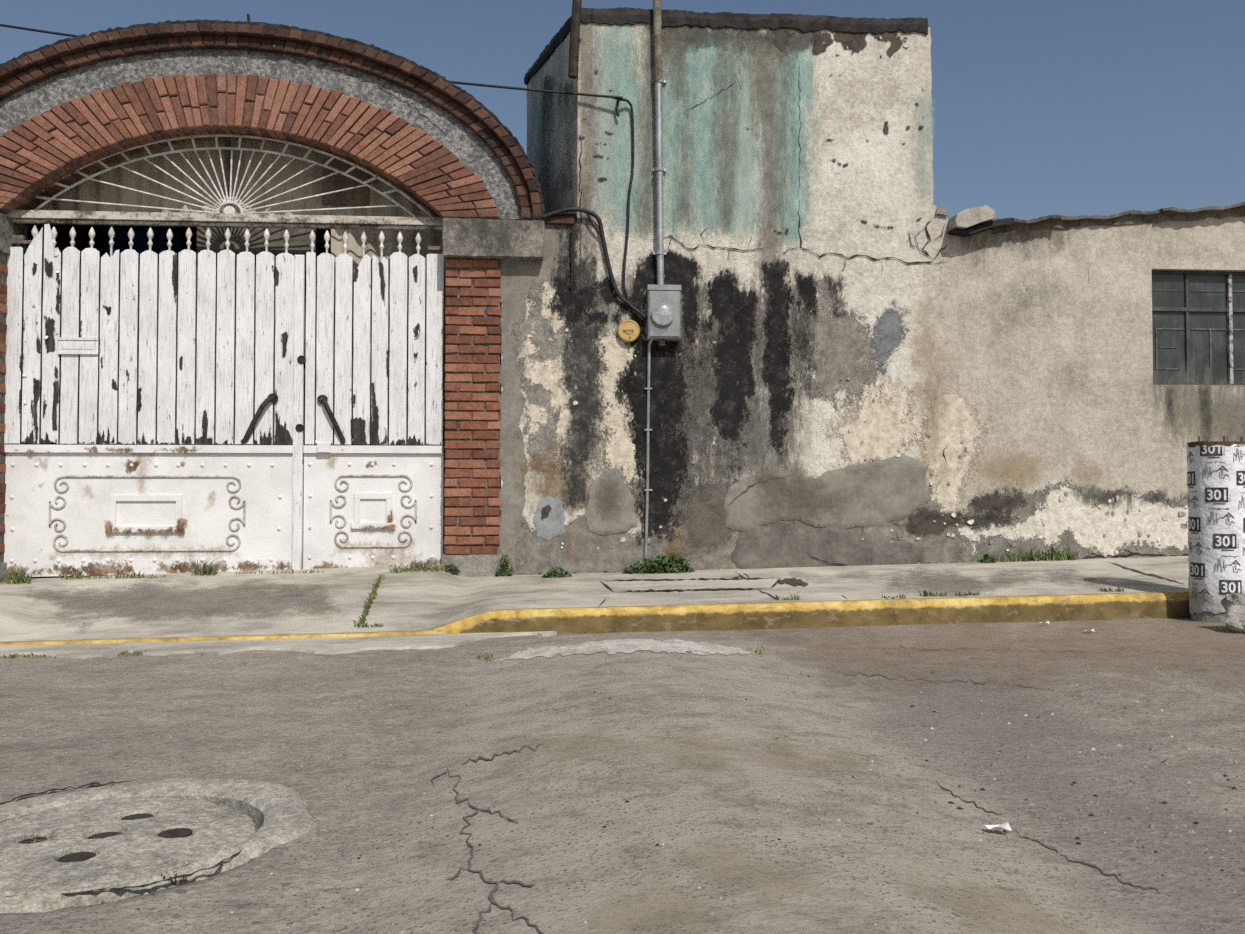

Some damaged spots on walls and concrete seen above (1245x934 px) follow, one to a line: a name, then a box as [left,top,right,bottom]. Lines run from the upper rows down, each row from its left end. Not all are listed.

crack [650,65,947,275]
water stain [531,23,846,548]
peeling [19,252,60,445]
rust [86,446,140,473]
peeling [77,410,232,445]
peeling [350,350,441,445]
flaking render [499,219,743,575]
peeling [791,275,1189,564]
water stain [1165,377,1245,441]
rust [7,560,133,577]
rust [105,518,187,536]
rust [158,561,292,573]